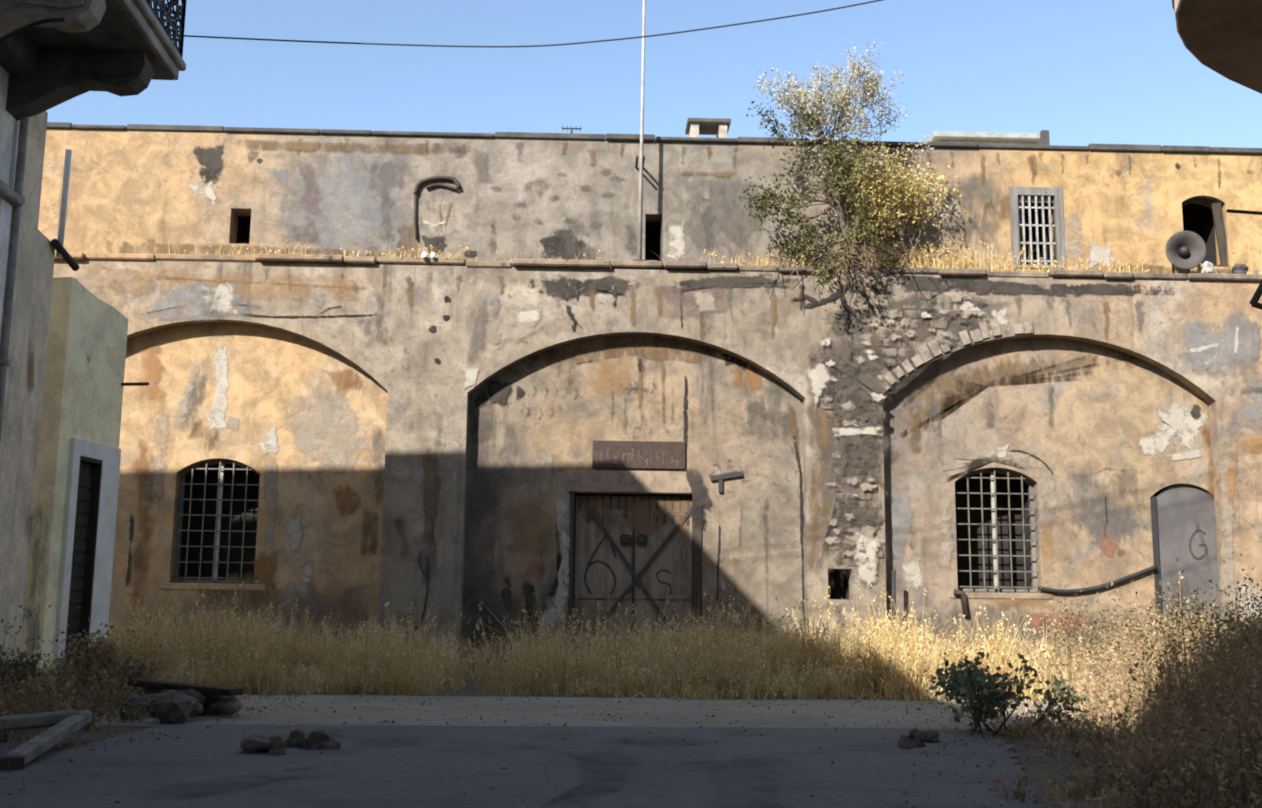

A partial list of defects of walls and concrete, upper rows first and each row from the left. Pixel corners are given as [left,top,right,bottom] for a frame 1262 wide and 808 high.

spalling [188,146,223,205]
flaking render [809,289,1033,591]
peeling [1139,402,1209,460]
peeling [937,444,1058,568]
peeling [1220,433,1262,627]